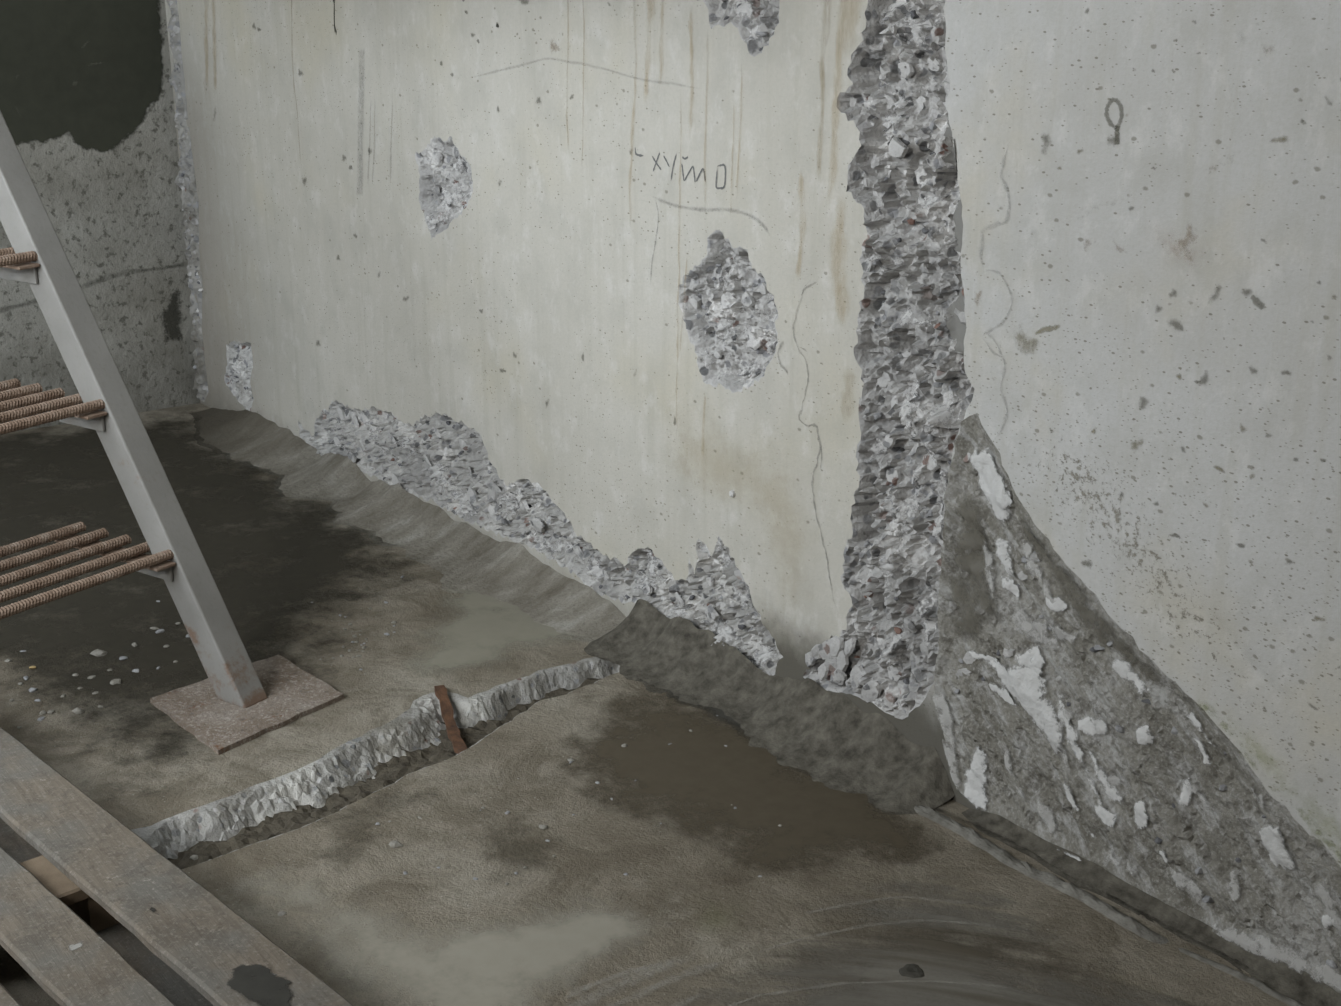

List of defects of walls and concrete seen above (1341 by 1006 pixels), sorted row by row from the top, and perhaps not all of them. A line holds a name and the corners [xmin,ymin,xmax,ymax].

spalling [697,0,780,57]
peeling [898,53,942,79]
flaking render [910,10,935,28]
peeling [916,95,940,130]
spalling [415,136,473,239]
spalling [677,230,778,393]
peeling [879,467,901,483]
spalling [298,400,783,675]
rust [434,685,468,754]
peeling [805,636,914,720]
spalling [920,413,1341,994]
water stain [564,689,927,870]